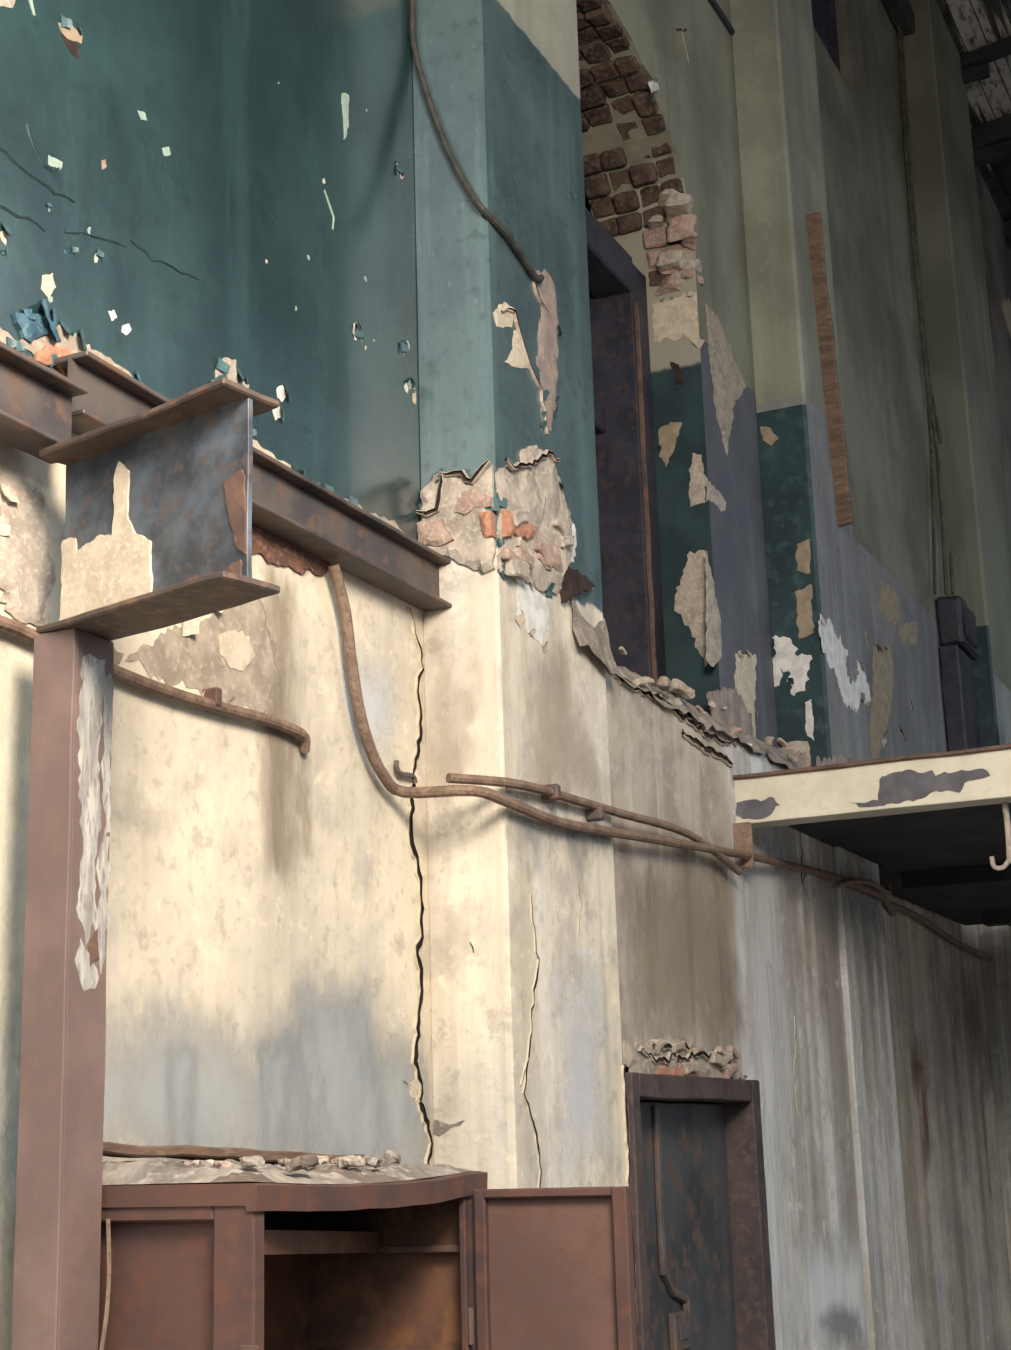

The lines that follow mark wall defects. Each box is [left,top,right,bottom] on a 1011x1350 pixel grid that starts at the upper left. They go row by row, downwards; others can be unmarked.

peeling [0,0,36,16]
crack [0,123,200,280]
peeling [209,357,249,388]
spalling [648,189,746,455]
spalling [0,484,56,626]
spalling [252,269,918,769]
peeling [850,769,990,807]
crack [403,607,465,1165]
leakage [103,989,428,1165]
crack [520,894,542,1188]
spalling [622,1035,745,1079]
leakage [892,1080,919,1292]